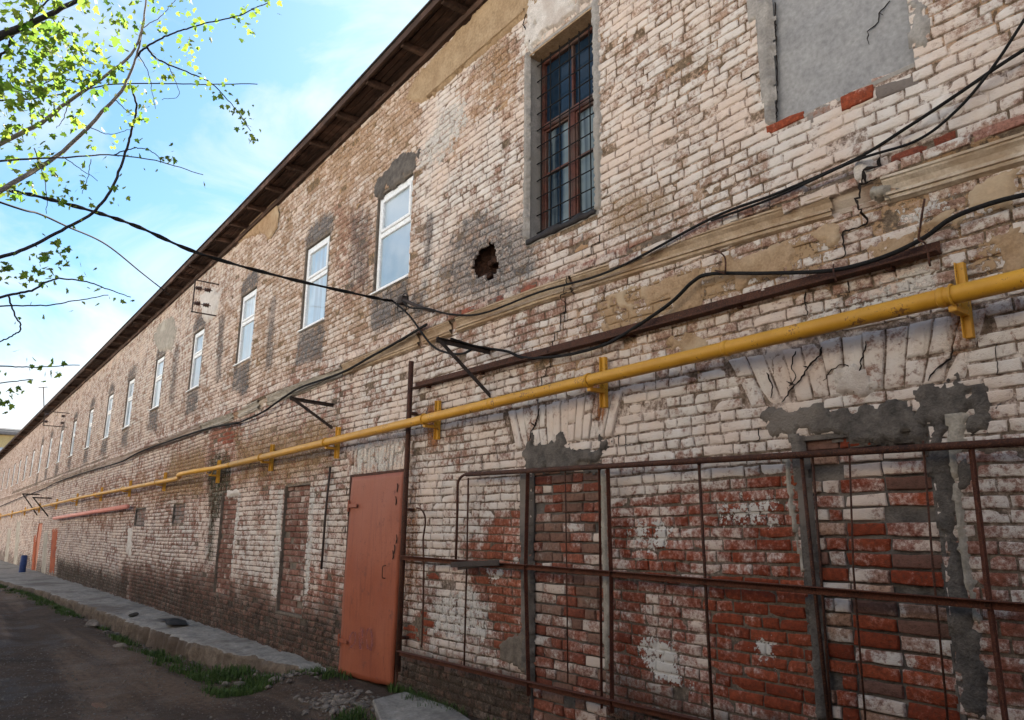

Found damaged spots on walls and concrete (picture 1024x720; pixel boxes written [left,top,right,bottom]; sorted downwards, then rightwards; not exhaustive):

crack [867,1,890,44]
spalling [473,242,499,281]
crack [831,157,882,297]
flaking render [964,176,1024,275]
crack [767,341,867,402]
crack [928,347,954,381]
leakage [56,559,339,669]
peeling [403,511,531,649]
peeling [613,475,816,714]